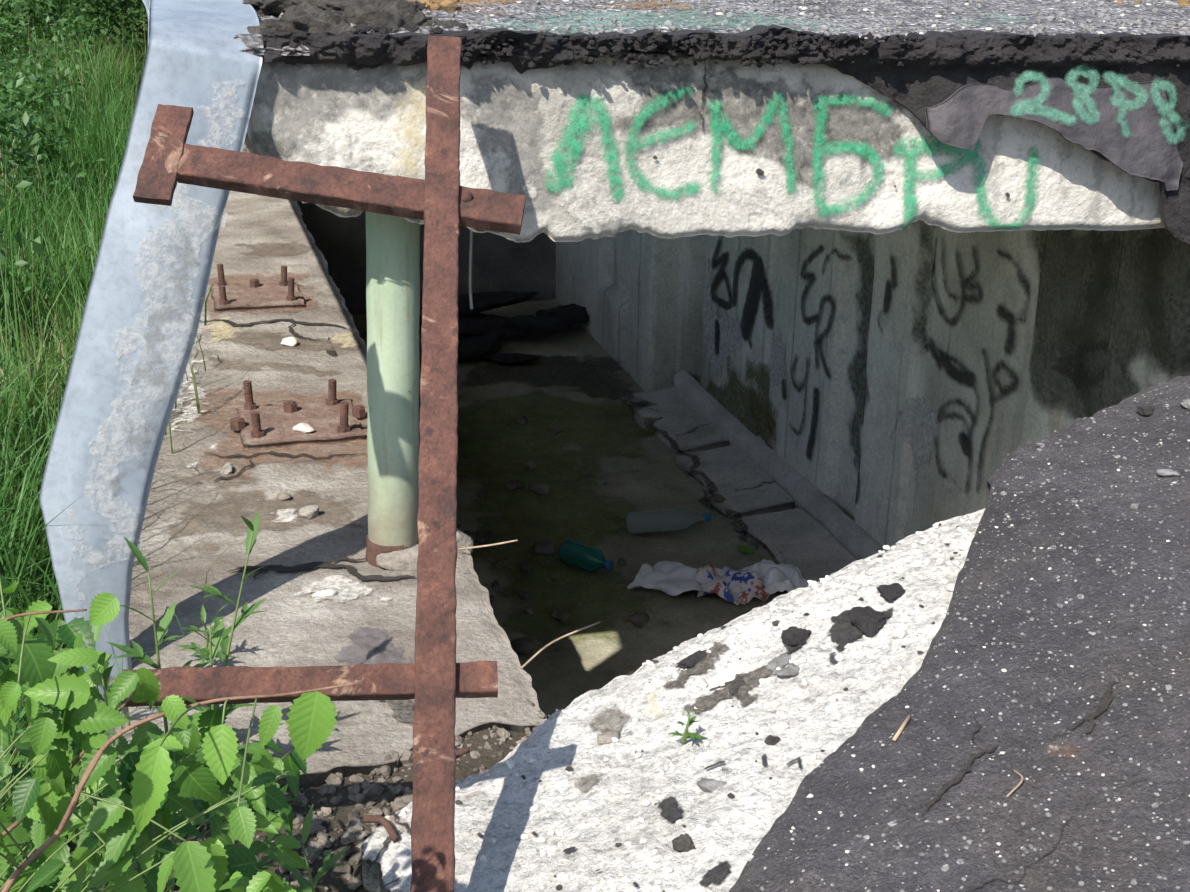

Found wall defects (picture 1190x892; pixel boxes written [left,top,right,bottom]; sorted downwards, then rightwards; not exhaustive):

crack [200,319,346,340]
water stain [848,237,875,503]
water stain [912,227,935,347]
water stain [1029,228,1190,418]
corrosion [195,388,368,475]
crack [624,395,774,550]
crack [228,556,415,581]